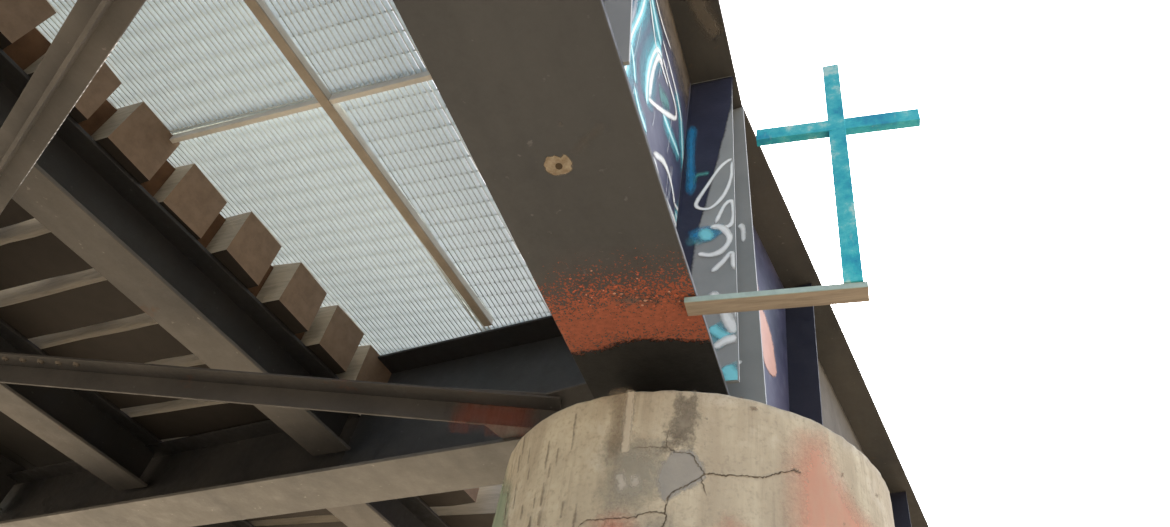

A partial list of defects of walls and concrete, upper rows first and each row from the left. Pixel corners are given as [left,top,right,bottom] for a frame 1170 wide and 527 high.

crack [578,435,801,527]